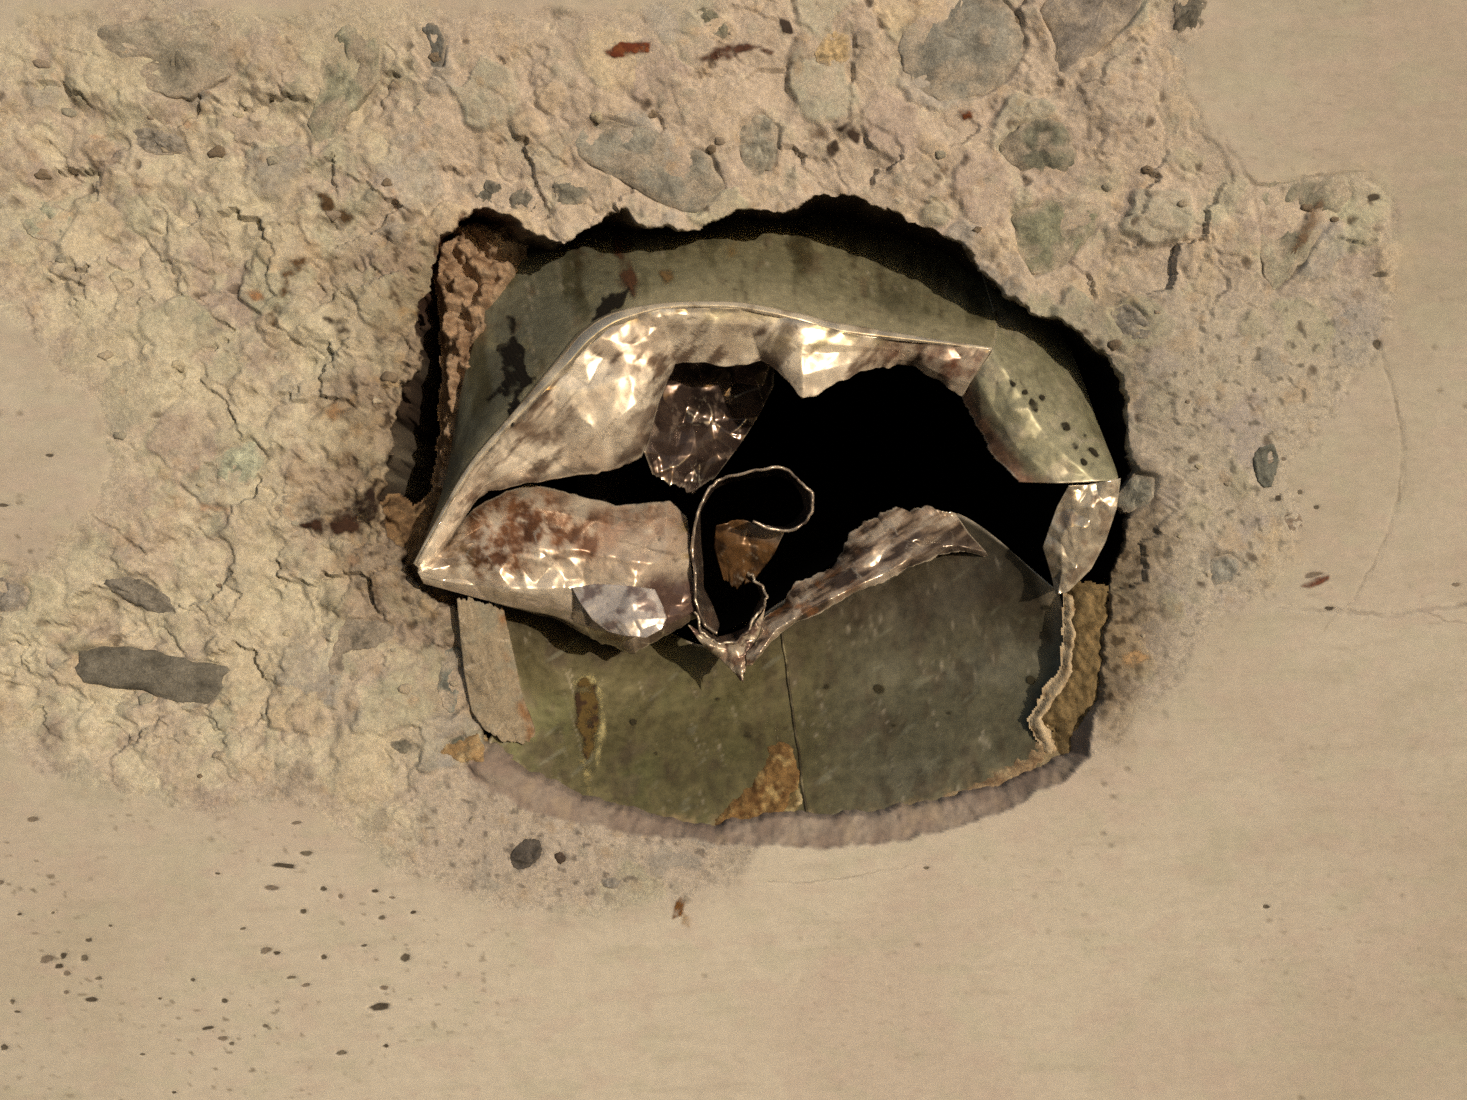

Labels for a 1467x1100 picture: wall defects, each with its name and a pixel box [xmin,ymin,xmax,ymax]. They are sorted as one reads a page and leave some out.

corrosion [574,676,605,777]
spalling [0,0,1403,919]